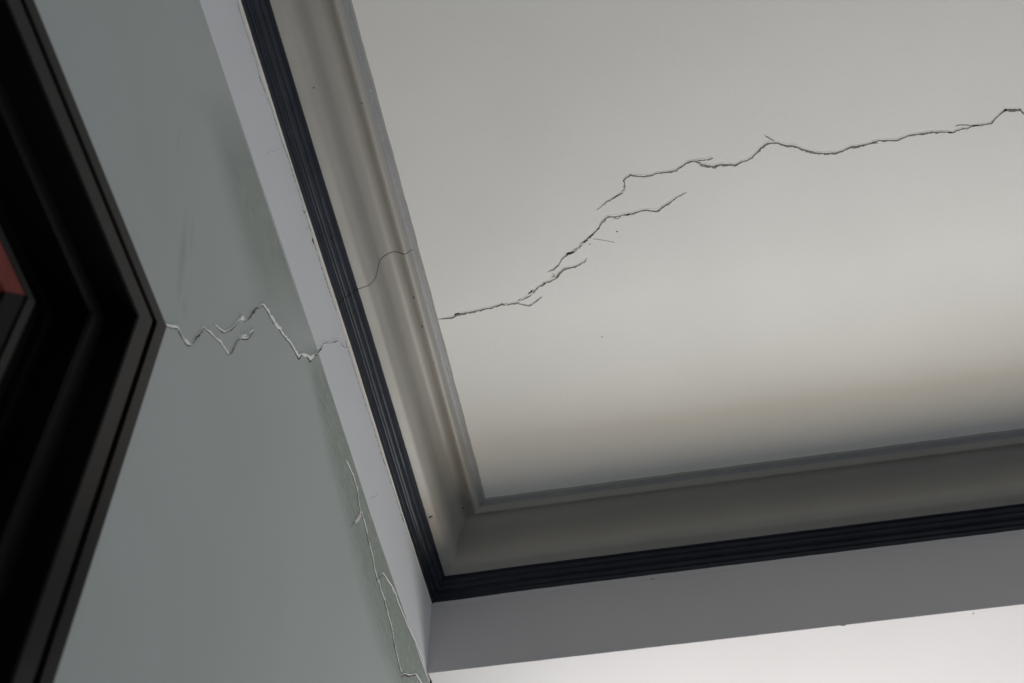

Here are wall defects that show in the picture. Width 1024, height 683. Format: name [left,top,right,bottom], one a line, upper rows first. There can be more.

crack [438,108,1024,320]
crack [166,304,432,683]